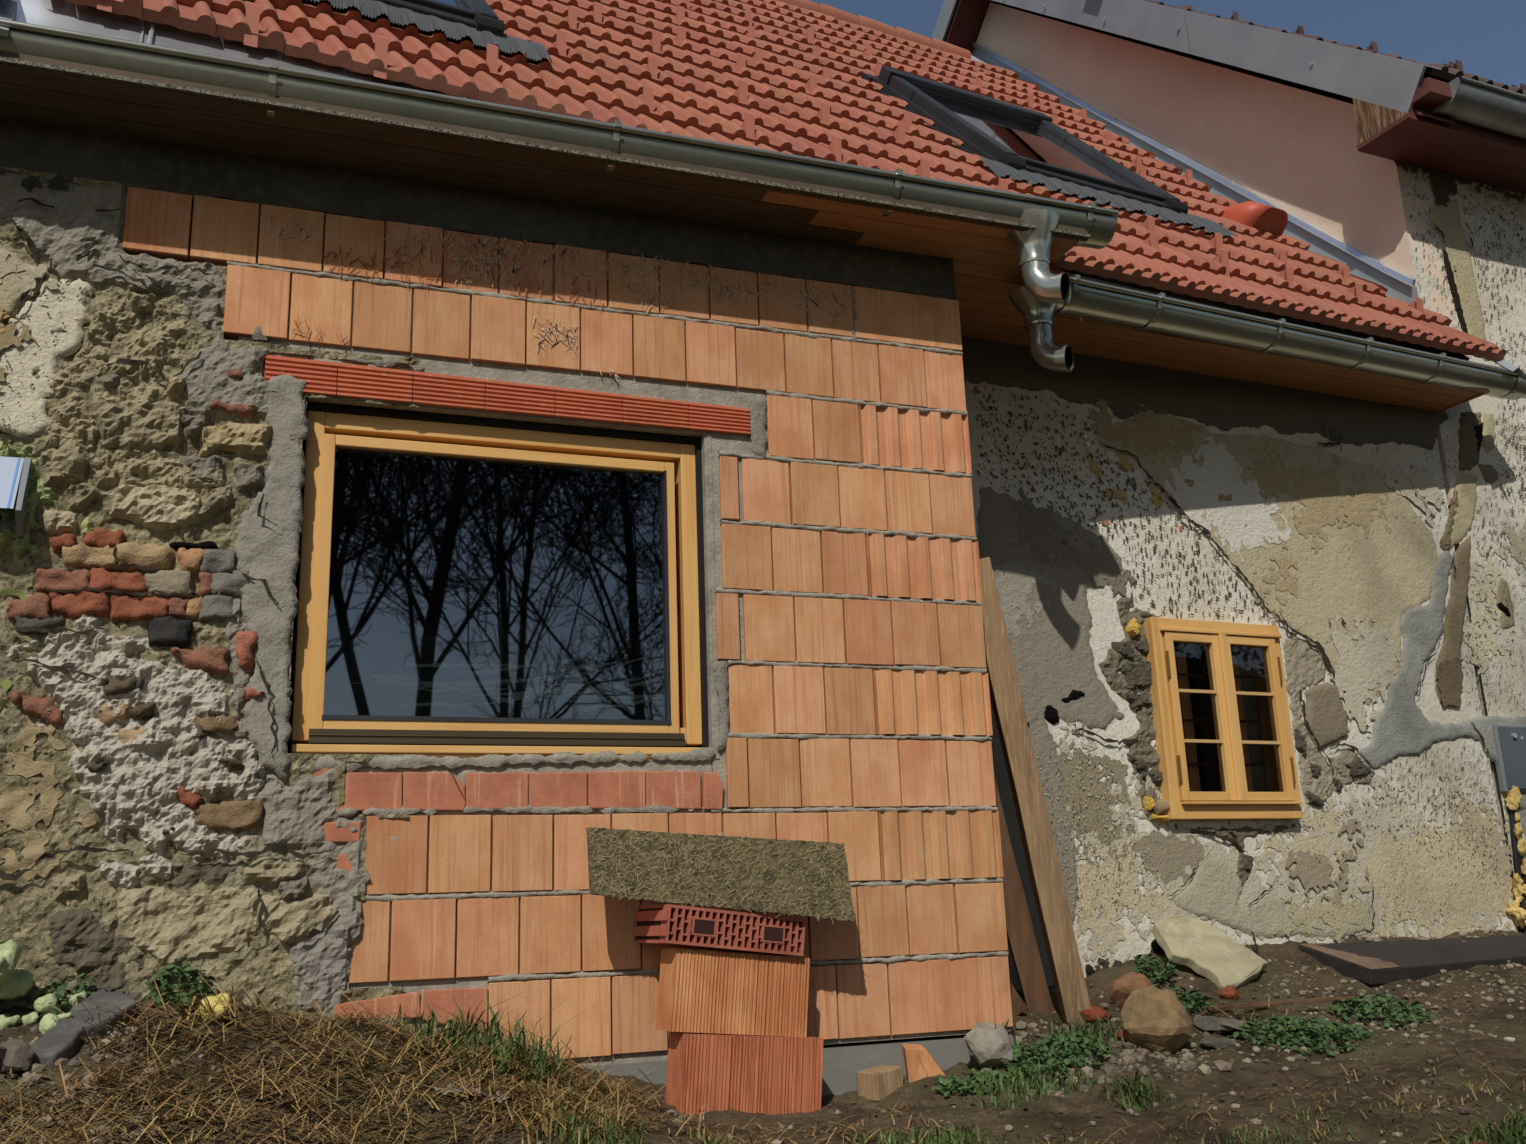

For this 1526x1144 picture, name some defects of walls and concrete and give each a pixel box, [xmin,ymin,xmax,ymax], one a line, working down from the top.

spalling [0,248,273,702]
peeling [1163,435,1291,563]
crack [1100,443,1375,773]
spalling [85,760,110,773]
spalling [95,673,156,757]
flaking render [194,714,238,740]
flaking render [178,786,264,833]
spalling [221,757,245,771]
spalling [1098,596,1296,887]
peeling [1282,613,1401,807]
spalling [46,856,334,1001]
spalling [1085,939,1165,977]